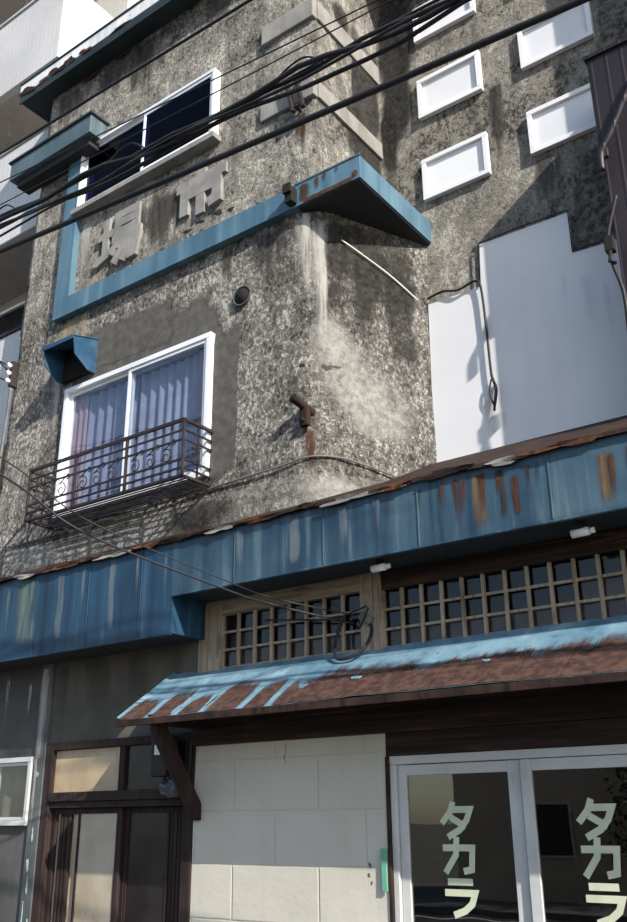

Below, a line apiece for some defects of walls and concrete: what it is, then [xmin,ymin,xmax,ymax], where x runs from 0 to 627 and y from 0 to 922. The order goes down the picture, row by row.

corrosion [301,170,357,202]
water stain [223,249,232,270]
water stain [256,214,416,333]
corrosion [306,430,314,461]
corrosion [440,474,486,522]
corrosion [511,466,529,513]
corrosion [598,453,616,499]
corrosion [120,635,627,719]